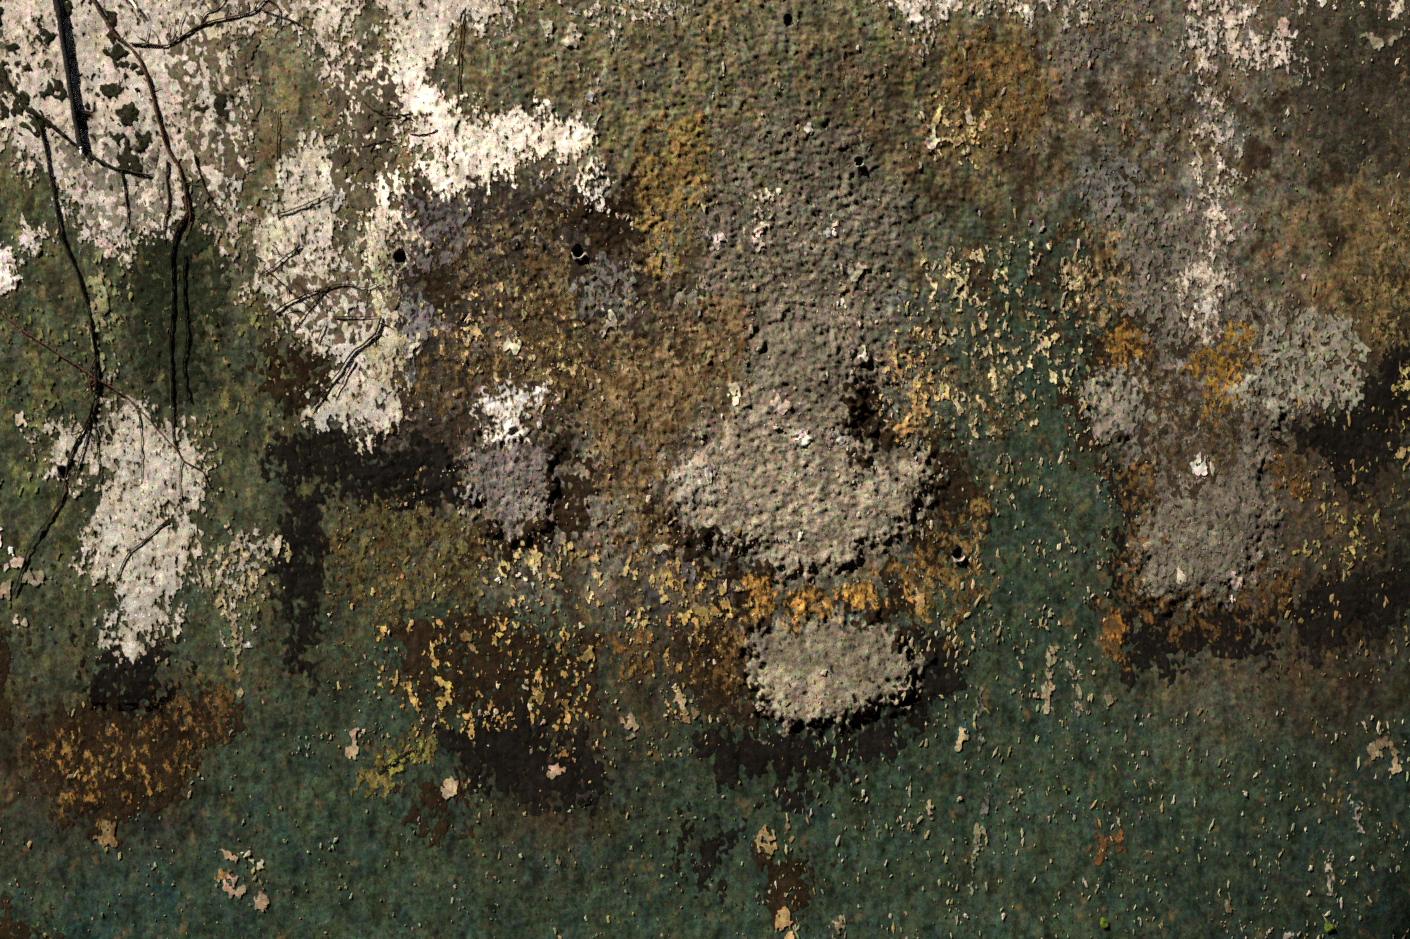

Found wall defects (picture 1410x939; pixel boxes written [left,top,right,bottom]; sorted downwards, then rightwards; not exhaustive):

peeling [0,0,695,528]
peeling [15,362,292,668]
flaking render [661,450,727,521]
peeling [47,717,204,803]
peeling [345,728,361,760]
peeling [373,529,764,779]